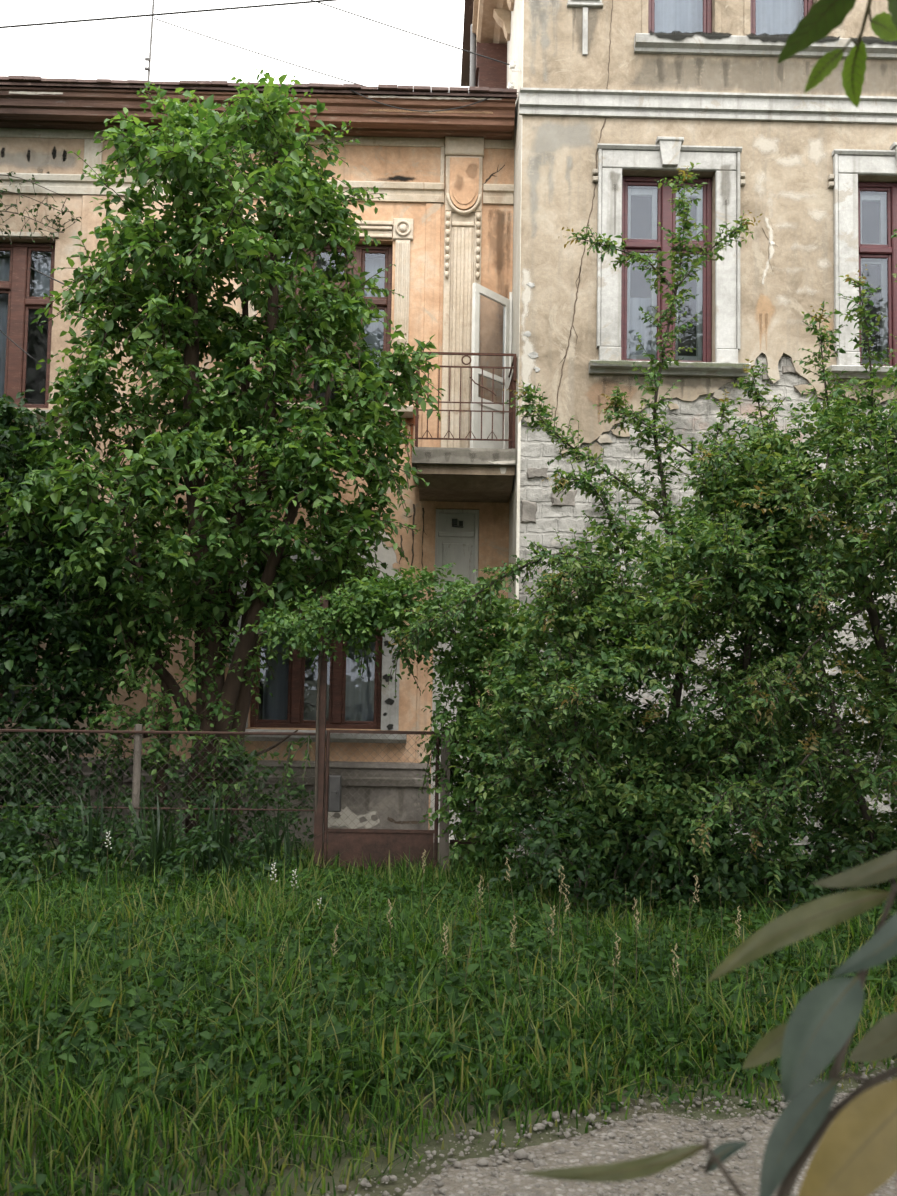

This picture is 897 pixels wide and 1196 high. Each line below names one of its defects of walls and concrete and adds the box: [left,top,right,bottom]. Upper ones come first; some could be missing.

crack [554,0,613,426]
spalling [519,269,897,685]
spalling [589,559,897,778]
spalling [328,807,380,829]
spalling [730,783,897,862]